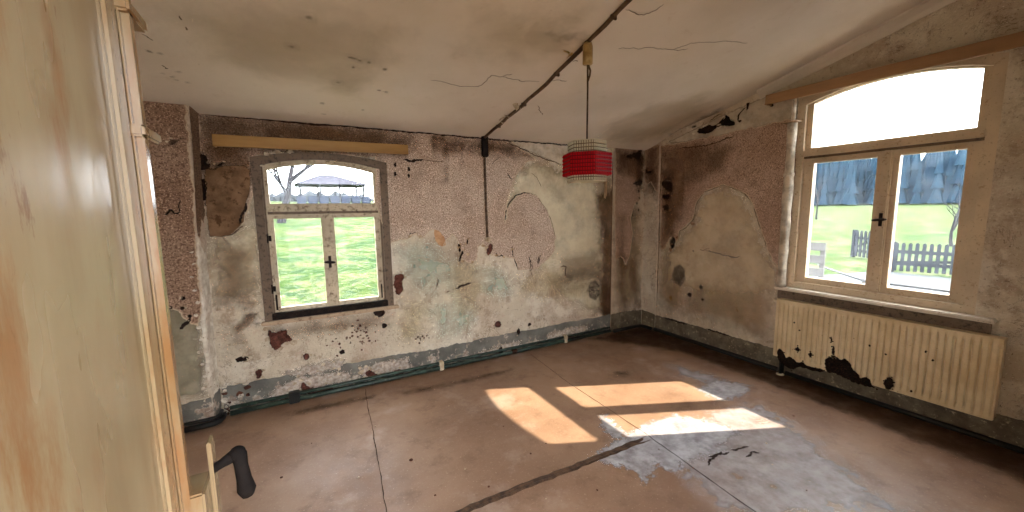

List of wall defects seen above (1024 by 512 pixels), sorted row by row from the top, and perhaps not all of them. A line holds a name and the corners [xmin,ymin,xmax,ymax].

peeling [670,91,798,142]
spalling [200,154,226,201]
spalling [661,177,675,213]
peeling [504,140,602,307]
peeling [669,186,775,302]
rust [777,337,895,390]
leakage [597,327,1024,479]